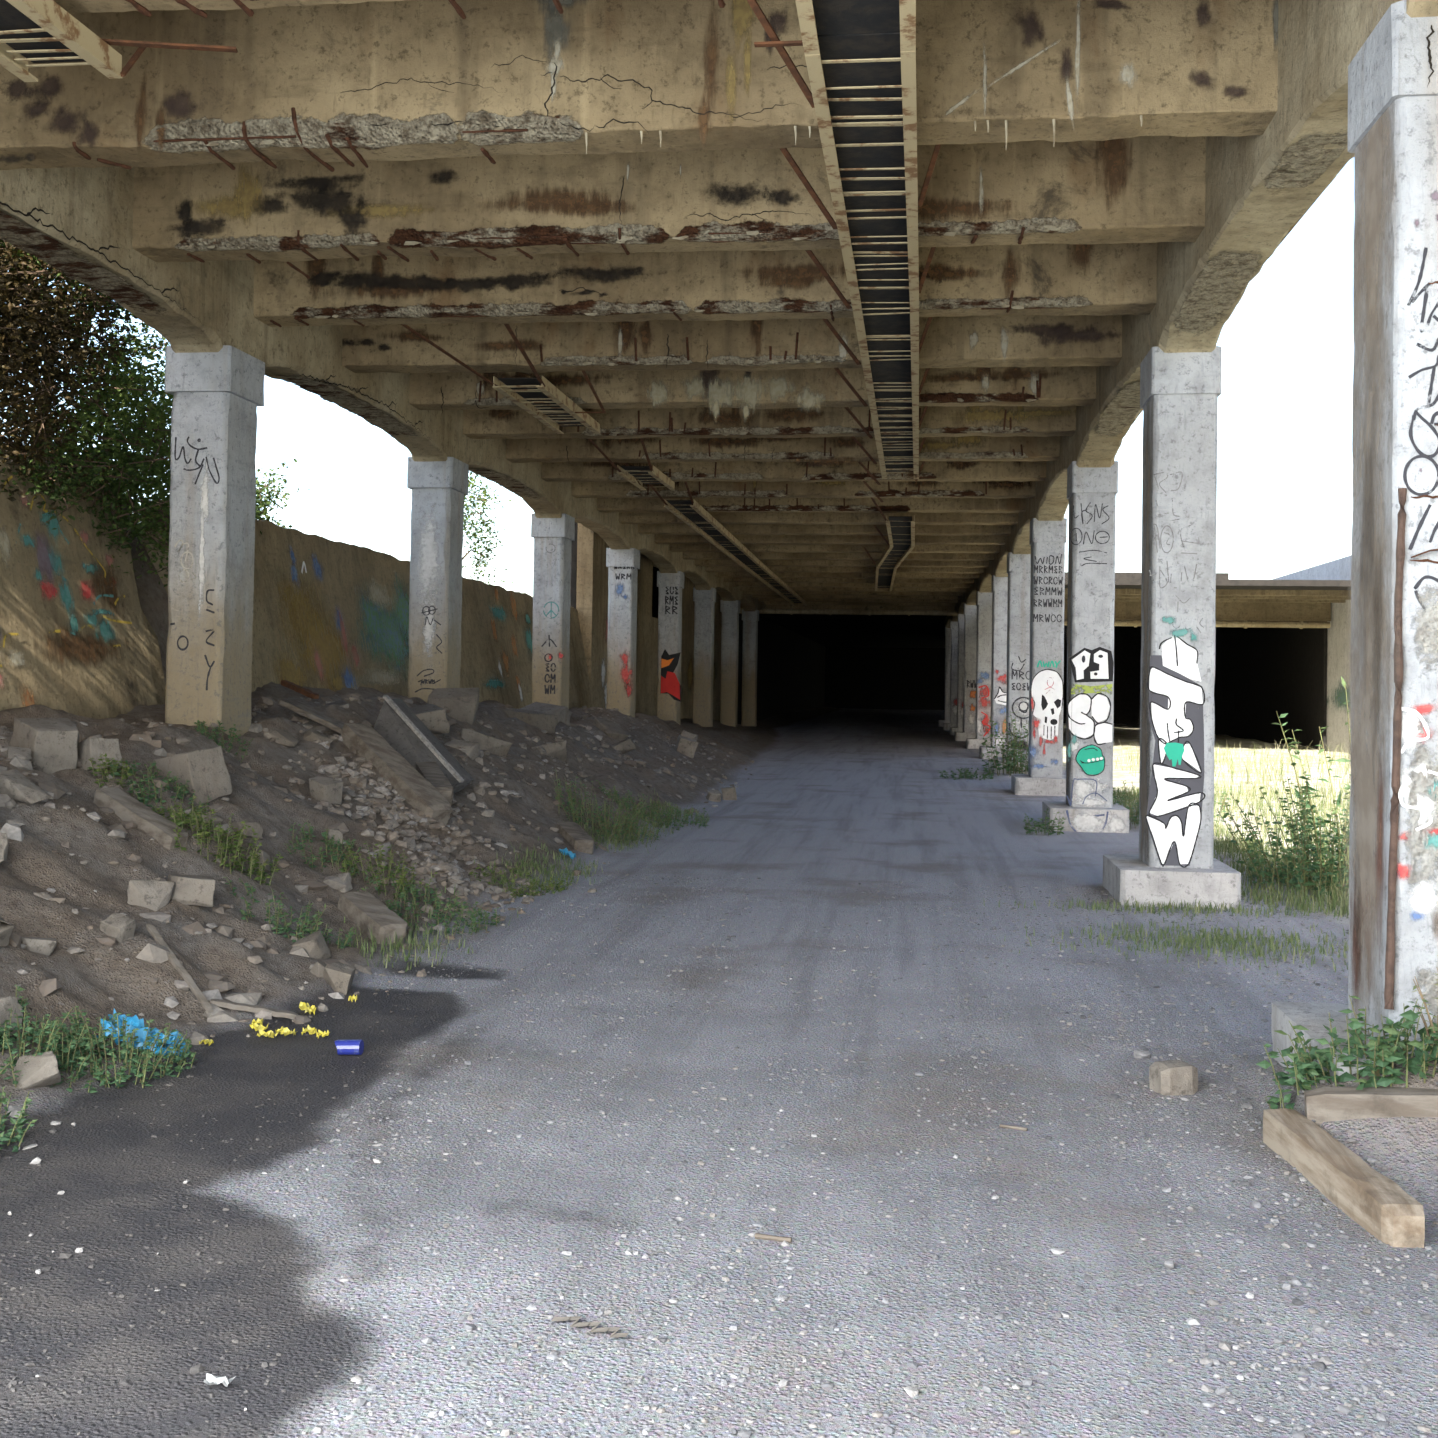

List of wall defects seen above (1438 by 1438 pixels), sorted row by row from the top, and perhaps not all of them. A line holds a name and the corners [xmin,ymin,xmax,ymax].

spalling [125,0,152,17]
spalling [175,0,208,18]
spalling [233,0,254,17]